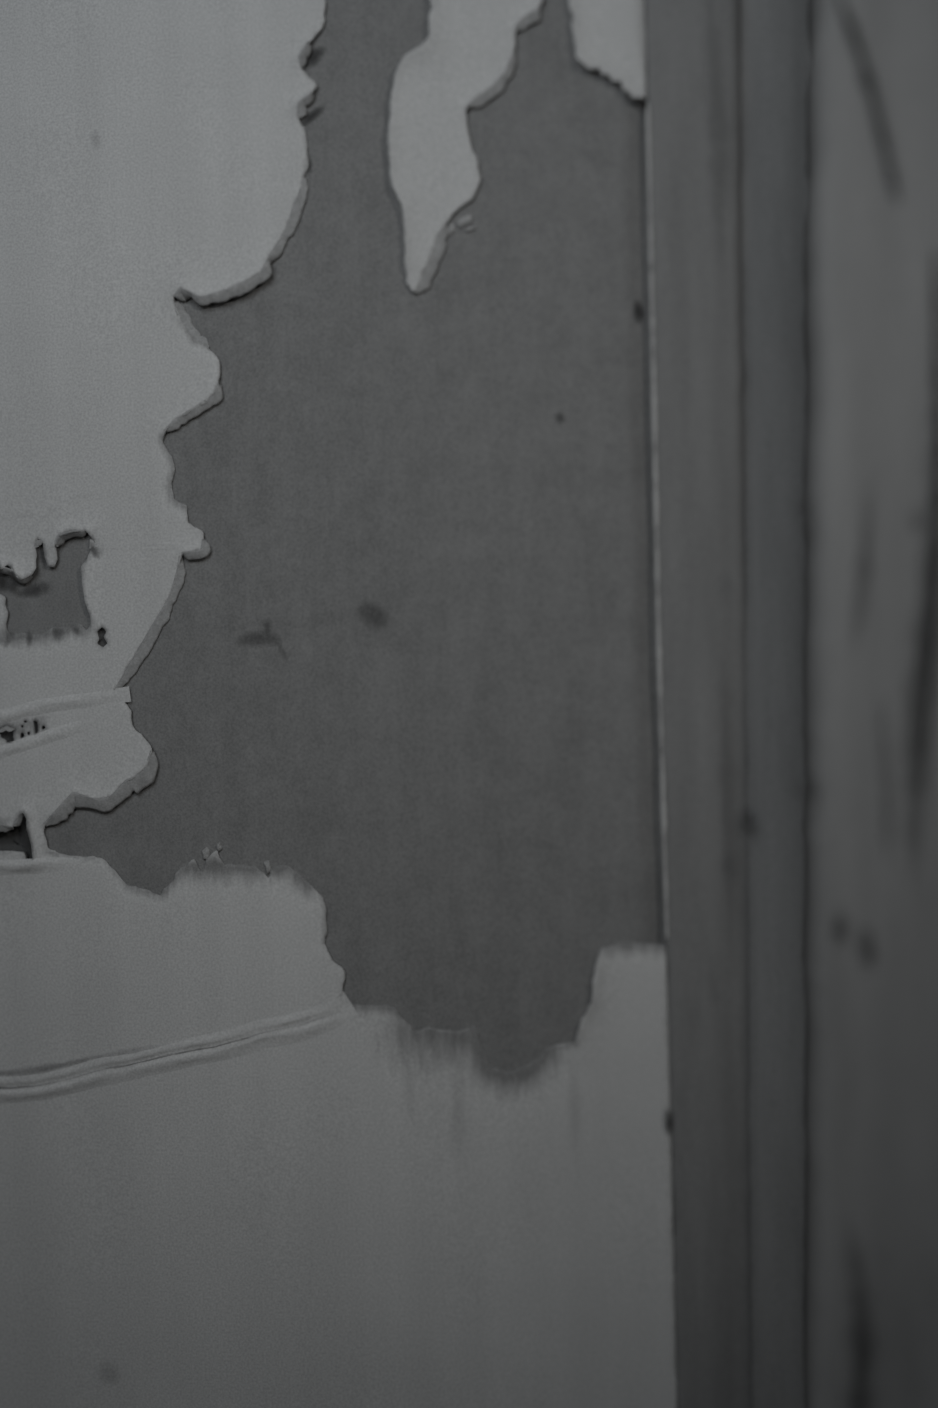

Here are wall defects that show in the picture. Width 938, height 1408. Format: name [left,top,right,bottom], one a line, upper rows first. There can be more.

peeling [0,529,107,647]
peeling [43,0,669,1072]